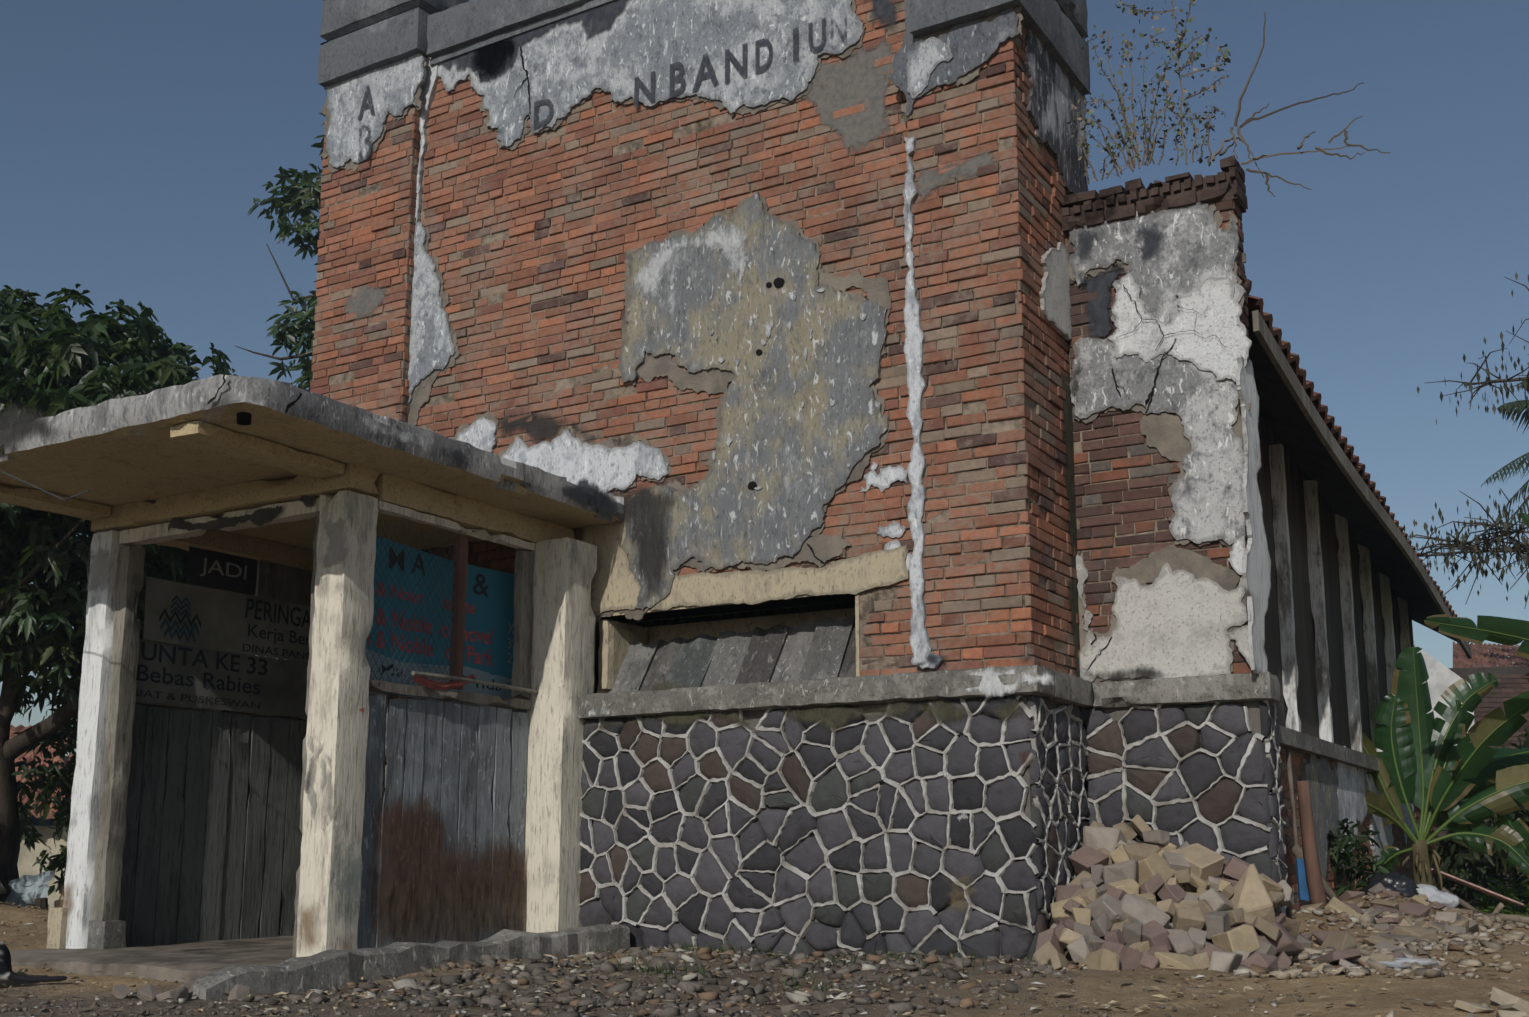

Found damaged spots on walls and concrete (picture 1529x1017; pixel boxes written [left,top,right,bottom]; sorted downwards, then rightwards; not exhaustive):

peeling [320,0,866,406]
peeling [422,6,1089,669]
peeling [1039,203,1271,682]
crack [1112,285,1231,413]
water stain [375,866,527,943]